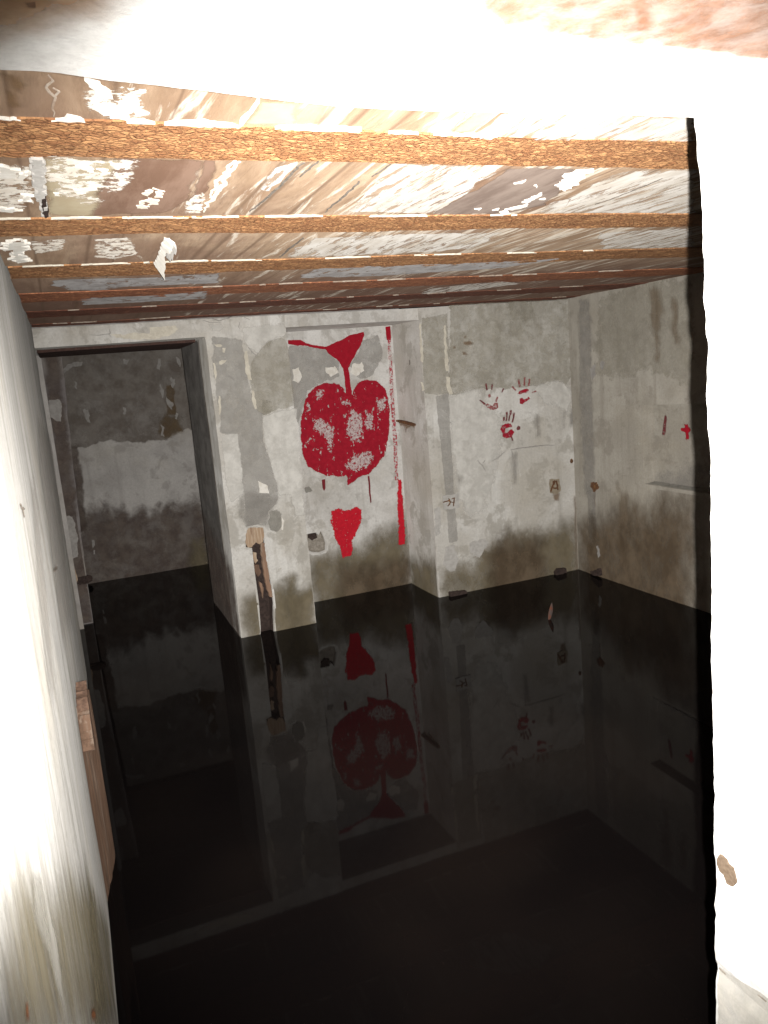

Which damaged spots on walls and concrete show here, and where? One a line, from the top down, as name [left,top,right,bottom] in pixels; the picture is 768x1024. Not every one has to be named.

peeling [51,77,239,128]
peeling [275,124,362,133]
peeling [0,156,140,220]
peeling [474,169,697,216]
peeling [0,238,65,268]
peeling [50,237,262,340]
water stain [33,341,260,680]
peeling [212,337,278,632]
water stain [274,280,694,631]